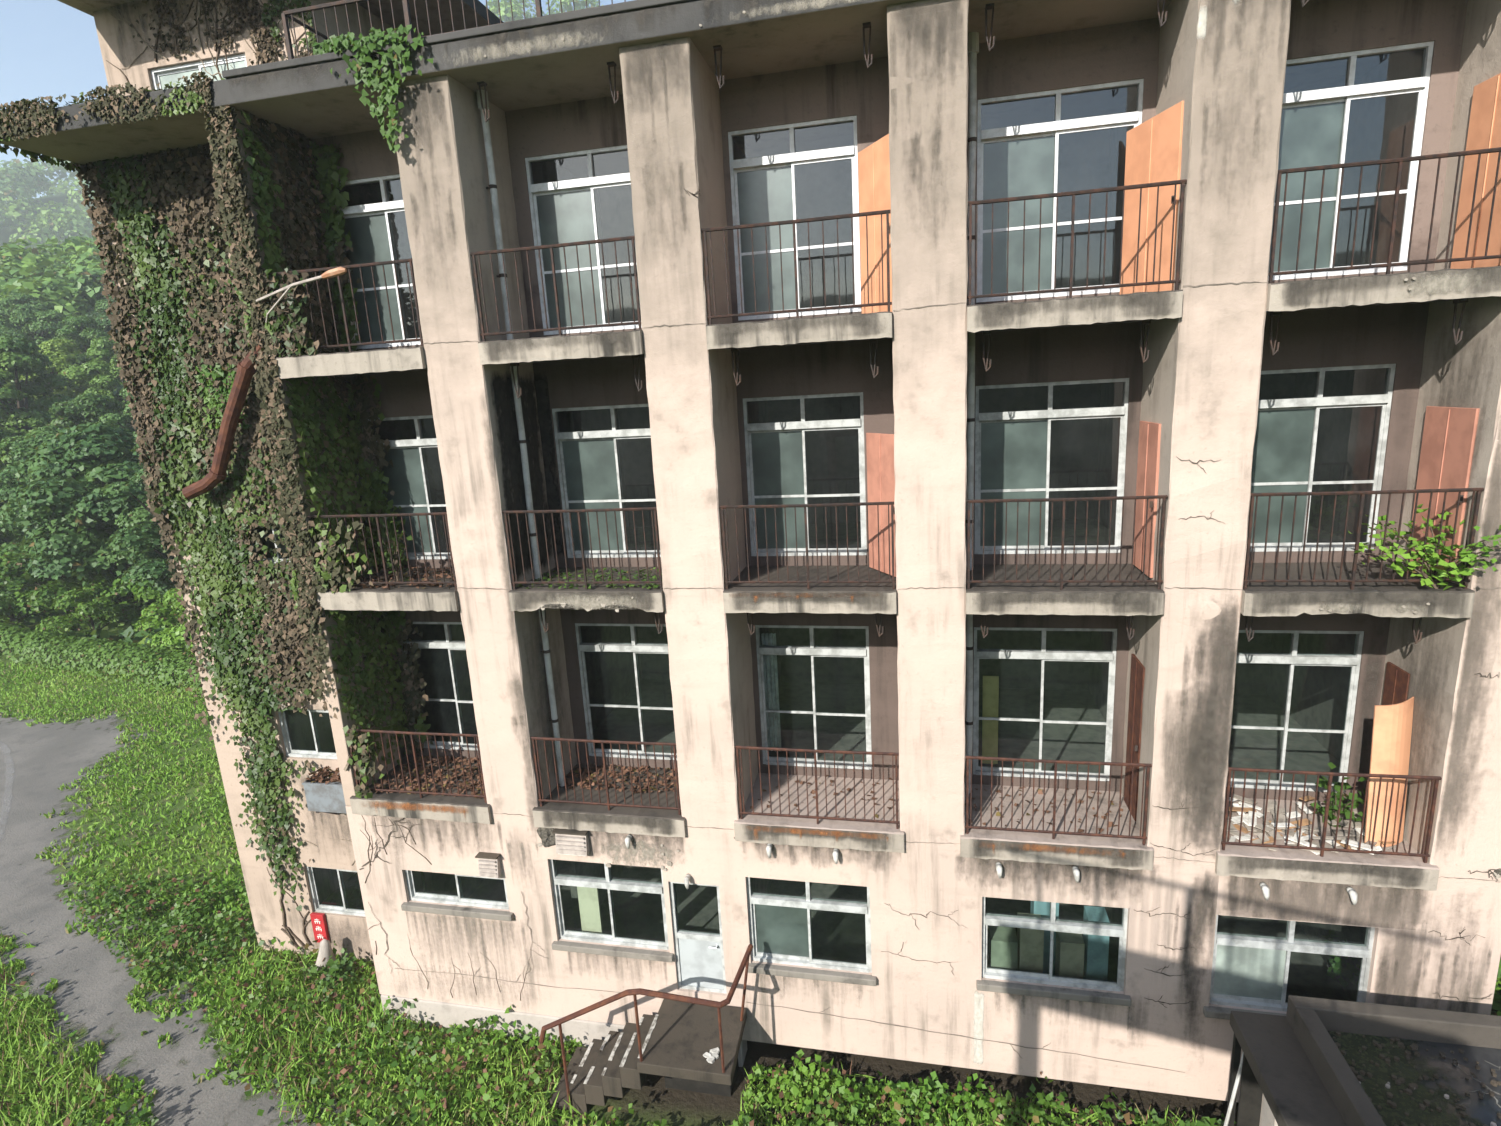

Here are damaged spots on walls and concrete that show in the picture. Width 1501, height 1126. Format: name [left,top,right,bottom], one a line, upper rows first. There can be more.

leakage [898,0,958,58]
leakage [1258,448,1501,833]
leakage [1169,608,1236,847]
corrosion [375,802,465,814]
crack [881,903,963,975]
crack [1135,908,1193,1008]
leakage [1183,857,1423,1017]